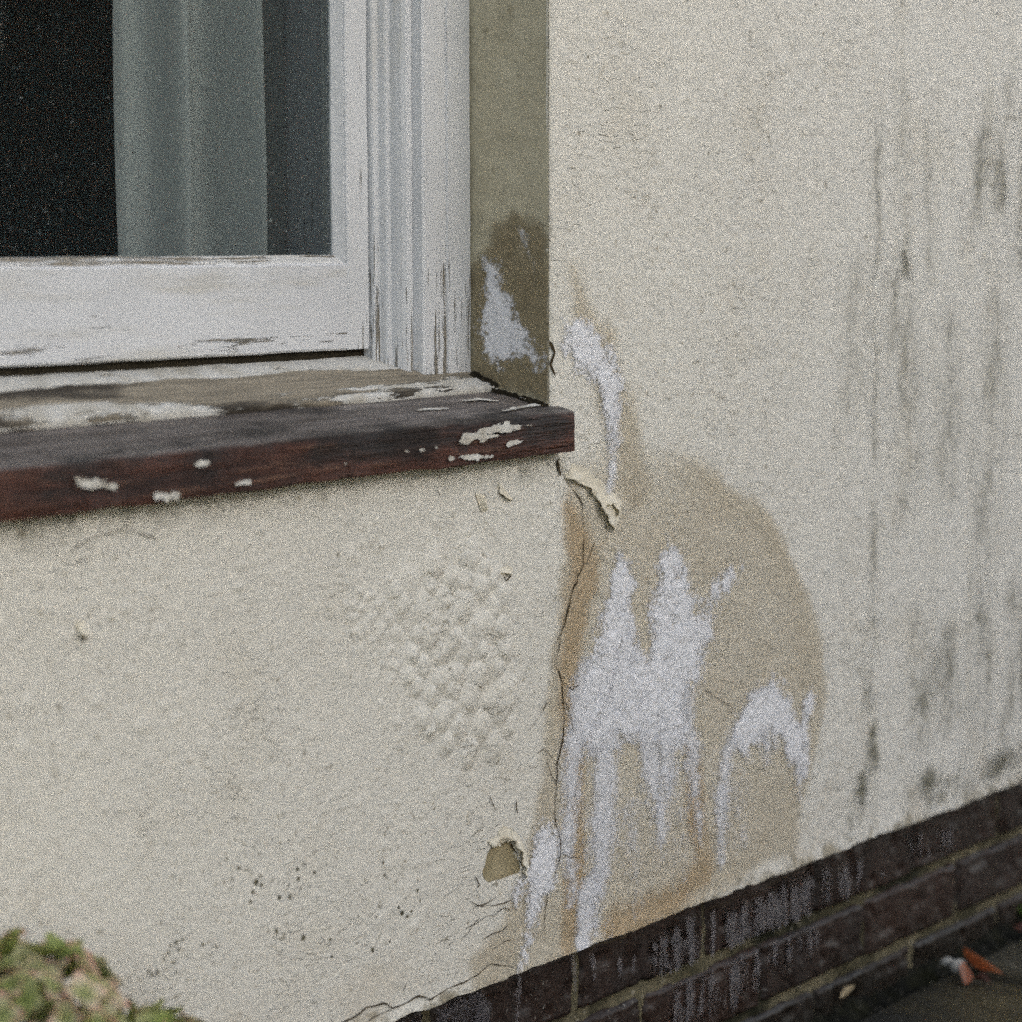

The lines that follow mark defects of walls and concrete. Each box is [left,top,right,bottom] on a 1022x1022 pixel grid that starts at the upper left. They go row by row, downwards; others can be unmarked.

damp [471,214,645,499]
peeling [448,397,548,461]
peeling [75,477,117,490]
peeling [153,490,180,502]
peeling [565,464,622,531]
crack [527,458,595,935]
damp [437,470,824,1022]
damp [856,726,879,808]
damp [923,772,944,801]
spalling [475,826,530,888]
crack [344,897,513,1022]